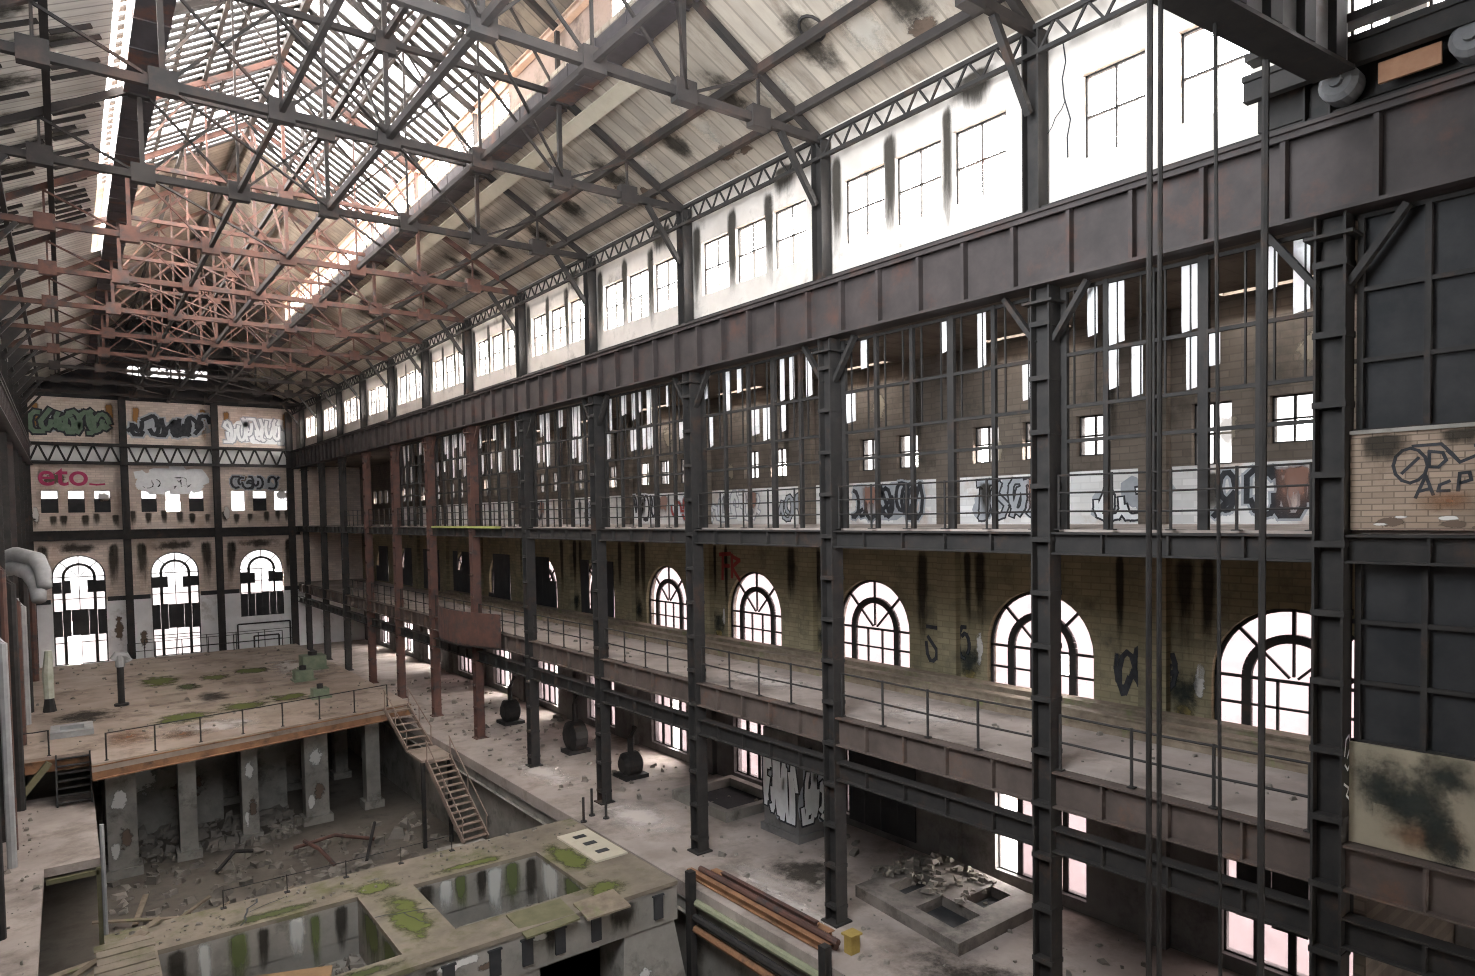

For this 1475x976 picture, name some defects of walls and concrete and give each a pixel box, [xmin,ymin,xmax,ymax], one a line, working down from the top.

damp [786,14,835,65]
damp [847,13,879,48]
damp [885,0,924,24]
damp [1356,754,1467,869]